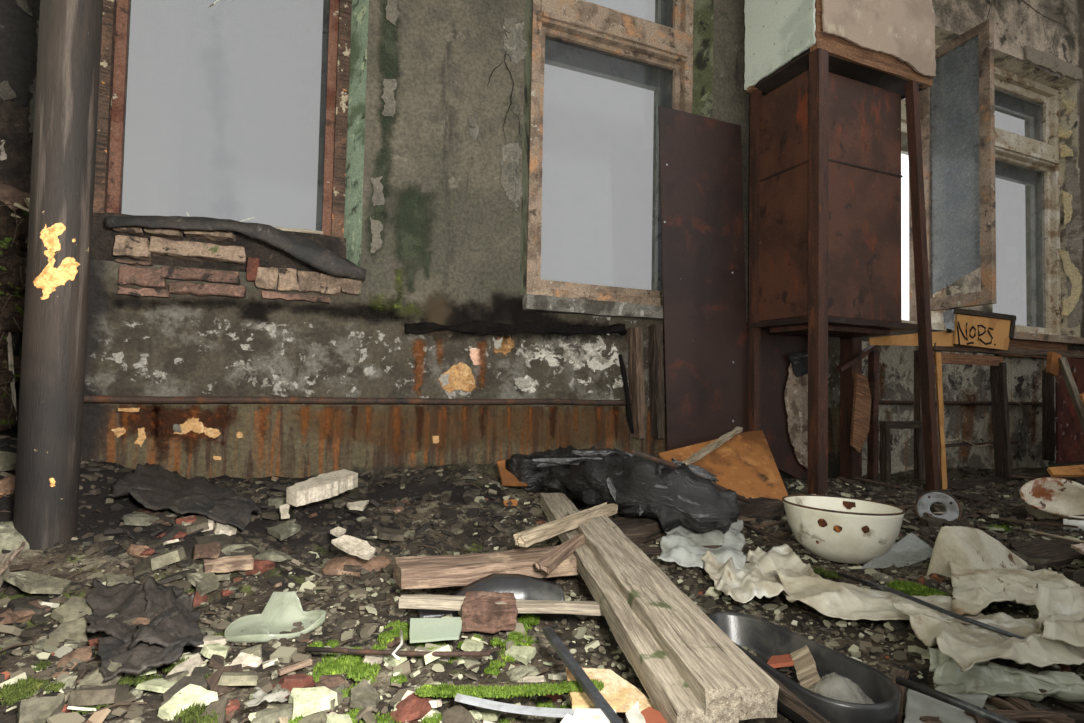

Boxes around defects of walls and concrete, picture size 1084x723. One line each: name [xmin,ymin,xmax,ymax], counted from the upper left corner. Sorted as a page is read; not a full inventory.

flaking render [0,20,39,194]
peeling [368,0,400,253]
crack [487,24,521,143]
peeling [33,223,80,300]
leakage [391,188,431,300]
peeling [1056,126,1084,328]
peeling [230,344,283,388]
peeling [438,348,480,393]
peeling [493,334,623,394]